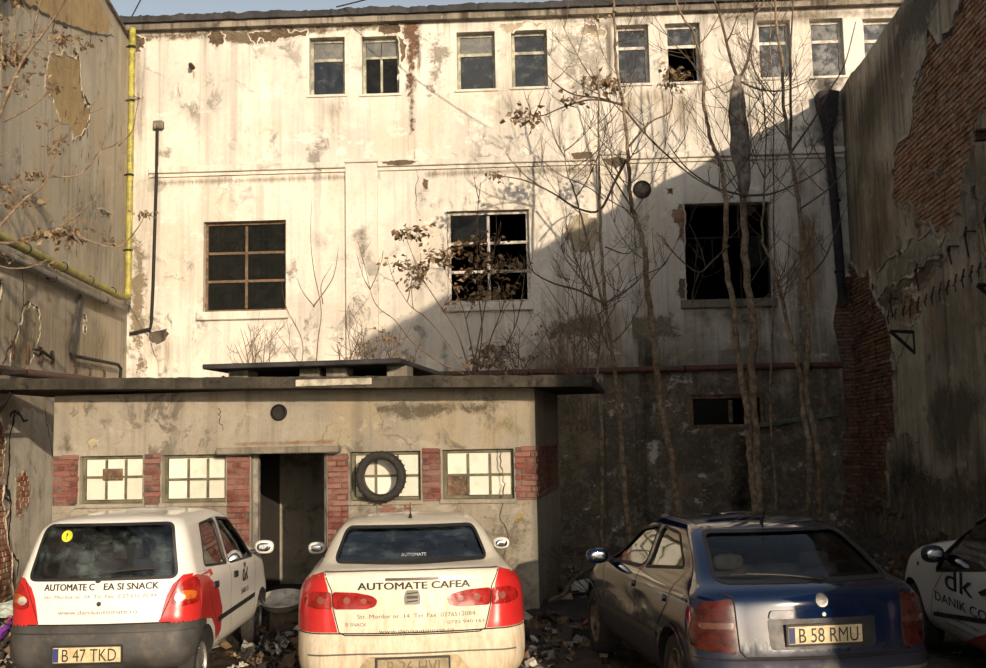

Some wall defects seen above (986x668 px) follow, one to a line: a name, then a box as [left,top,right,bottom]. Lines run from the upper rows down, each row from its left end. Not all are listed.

flaking render [206,30,226,50]
flaking render [247,28,309,45]
flaking render [664,186,686,247]
flaking render [848,0,986,513]
damp [632,315,684,443]
damp [377,402,487,419]
flaking render [0,407,54,603]